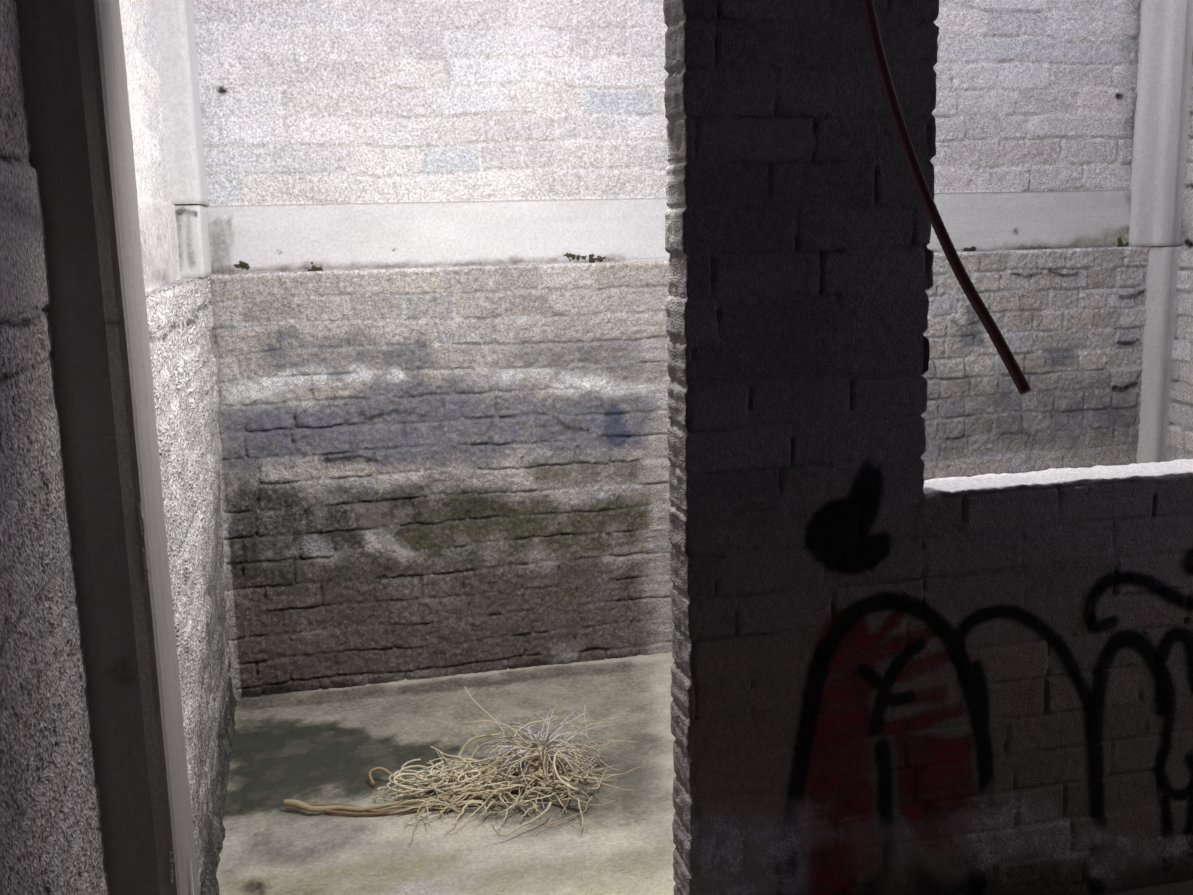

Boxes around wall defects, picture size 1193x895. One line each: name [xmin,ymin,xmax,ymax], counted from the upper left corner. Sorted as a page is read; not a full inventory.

leakage [201,331,654,824]